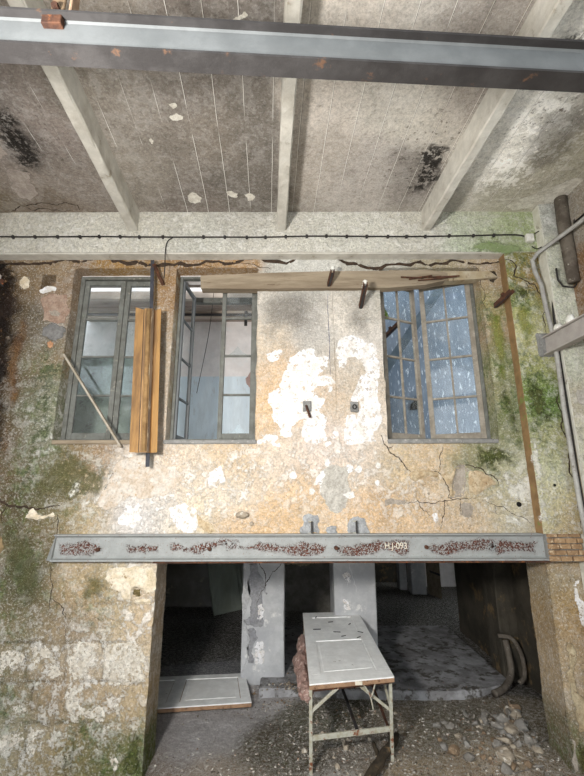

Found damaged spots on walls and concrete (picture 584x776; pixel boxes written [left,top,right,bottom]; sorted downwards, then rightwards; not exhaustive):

leakage [0,113,39,167]
leakage [412,144,448,192]
crack [0,259,91,267]
crack [111,259,295,269]
crack [339,259,546,331]
leakage [0,263,23,400]
peeling [256,335,382,447]
peeling [309,458,362,513]
rust [128,544,158,553]
rust [170,538,326,556]
rust [337,540,409,556]
spalling [242,563,267,673]